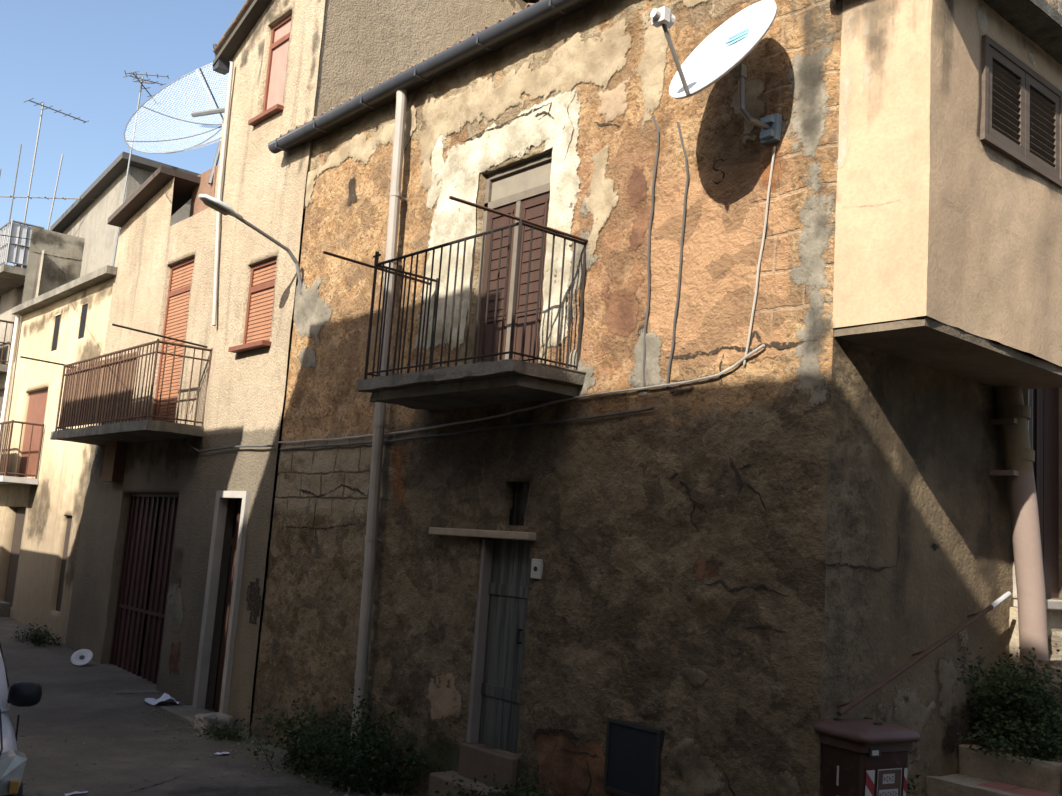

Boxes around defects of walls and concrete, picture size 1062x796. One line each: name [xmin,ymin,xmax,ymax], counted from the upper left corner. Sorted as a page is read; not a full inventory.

flaking render [670,0,708,9]
flaking render [304,7,669,396]
damp [781,9,836,408]
flaking render [293,275,332,370]
spalling [601,278,694,398]
crack [285,484,368,549]
crack [820,537,900,572]